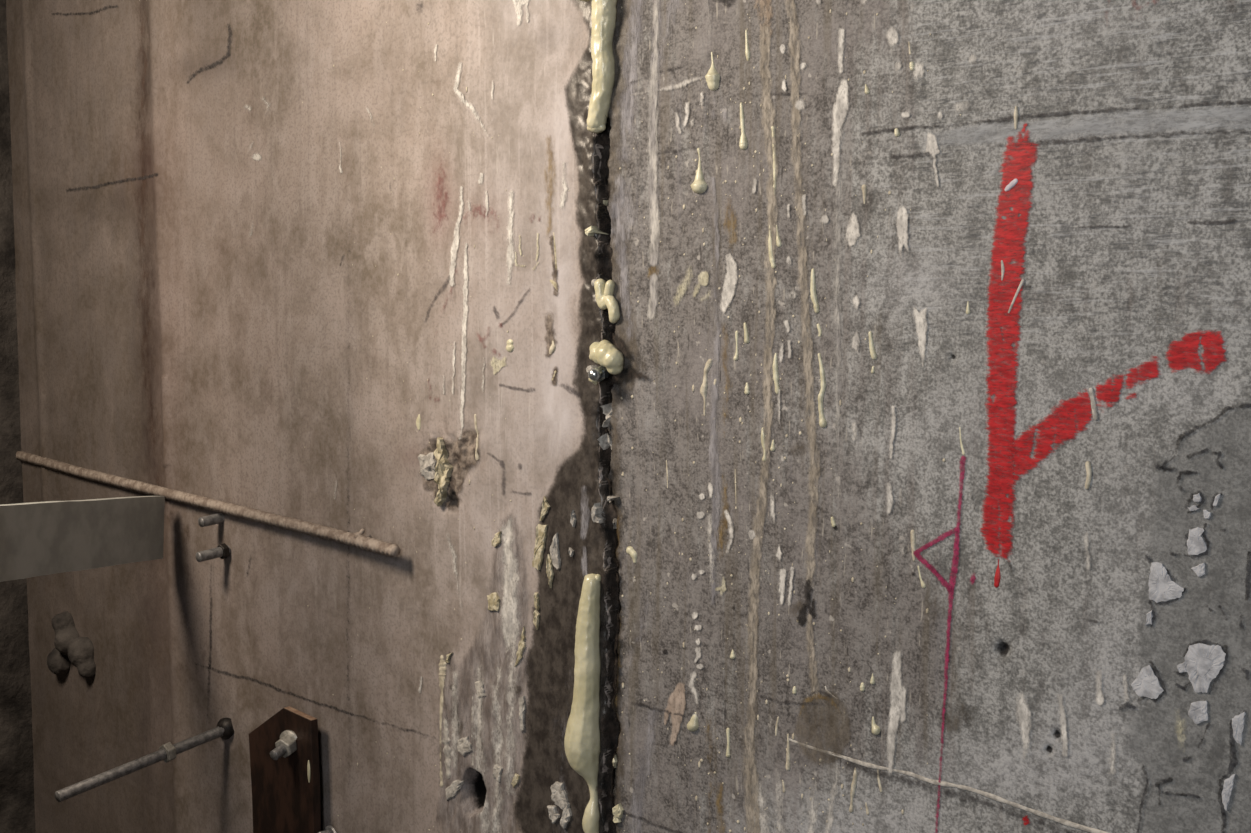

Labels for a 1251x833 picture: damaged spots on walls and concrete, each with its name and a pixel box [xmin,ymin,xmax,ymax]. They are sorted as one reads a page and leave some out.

crack [187,25,232,83]
crack [585,117,613,280]
spalling [418,414,480,510]
damp [514,0,660,833]
crack [586,310,691,833]
peeling [1145,404,1251,626]
crack [203,598,421,734]
peeling [1119,640,1228,761]
peeling [1137,766,1199,832]
peeling [1218,711,1246,833]